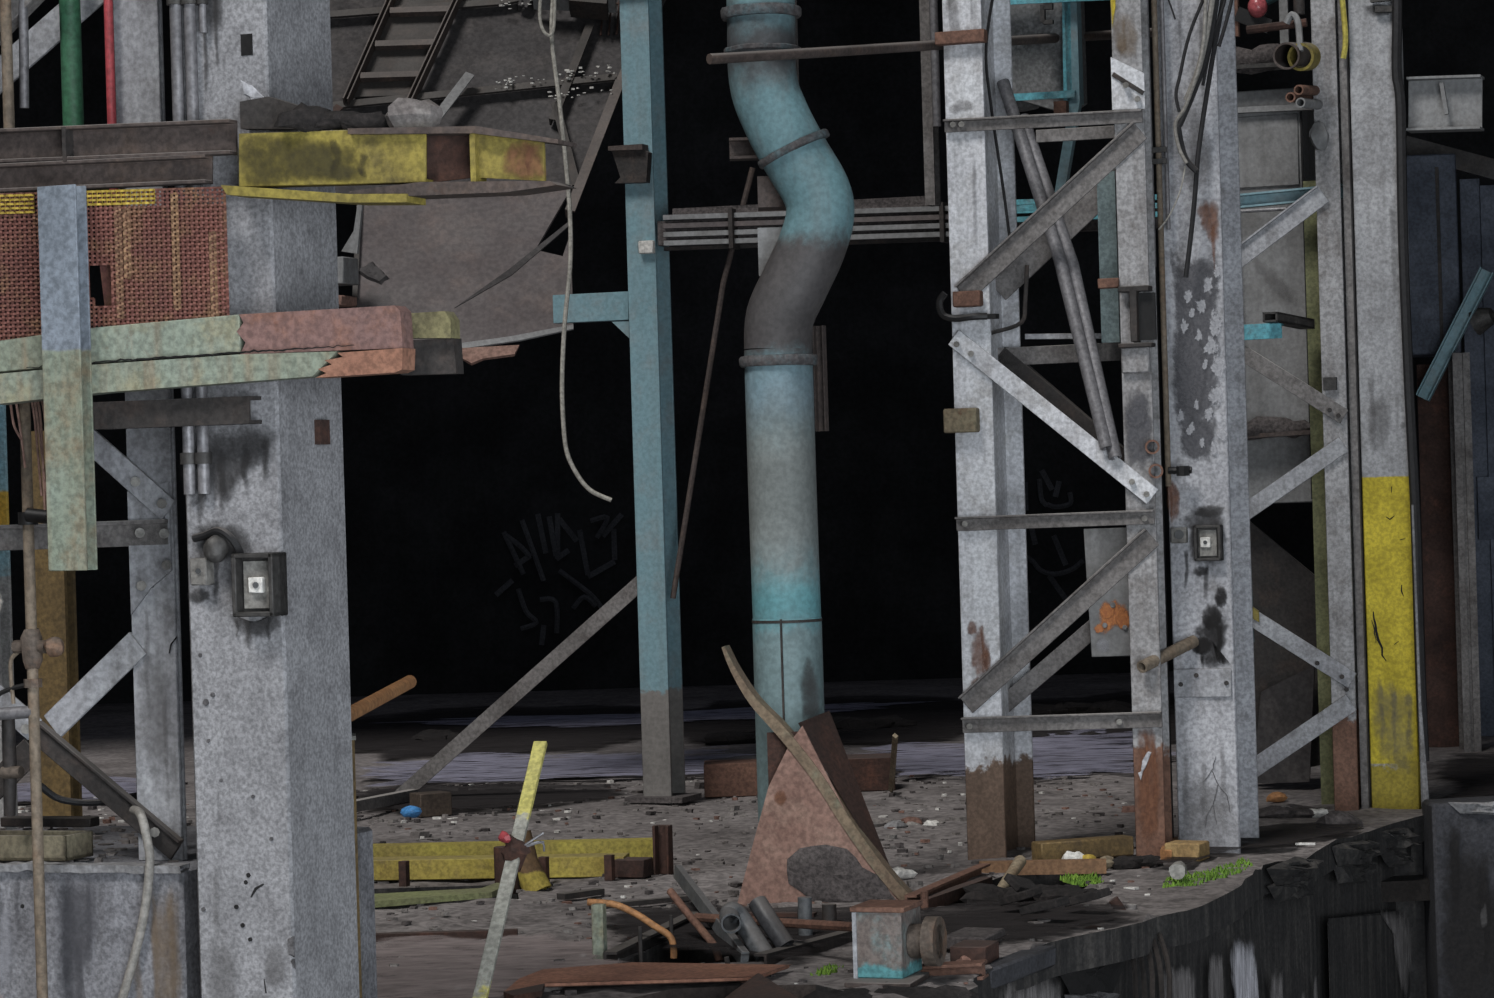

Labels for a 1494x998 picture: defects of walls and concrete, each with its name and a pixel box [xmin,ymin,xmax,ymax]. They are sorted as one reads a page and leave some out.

peeling [1172,257,1228,458]
rust [968,623,990,684]
rust [1139,736,1159,831]